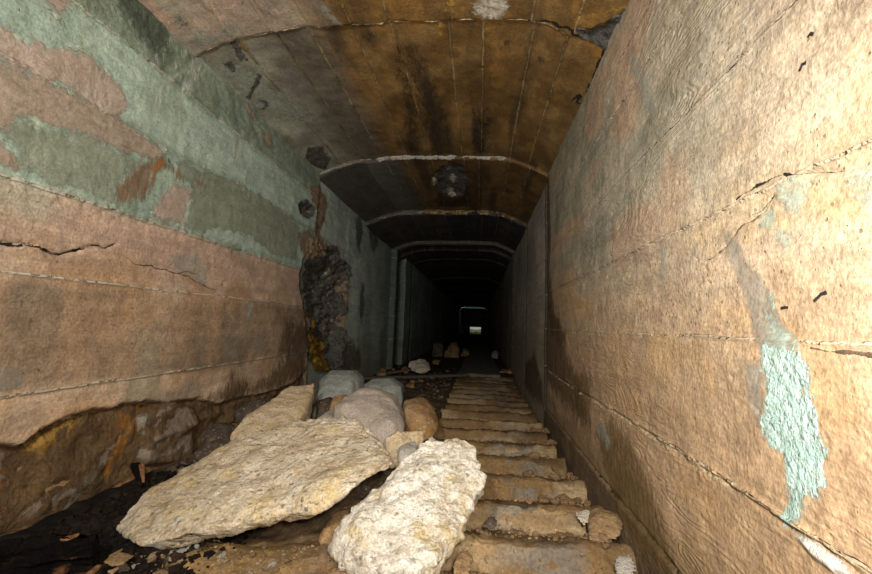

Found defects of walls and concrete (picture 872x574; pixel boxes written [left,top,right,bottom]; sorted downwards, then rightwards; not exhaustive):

efflorescence [460,0,566,34]
crack [535,20,590,37]
spalling [576,5,628,50]
peeling [0,26,166,160]
crack [571,49,605,104]
rust [117,158,184,204]
spalling [298,199,316,219]
crack [708,171,842,260]
crack [0,242,216,291]
spalling [299,235,352,372]
rust [27,421,77,452]
spalling [0,373,305,535]